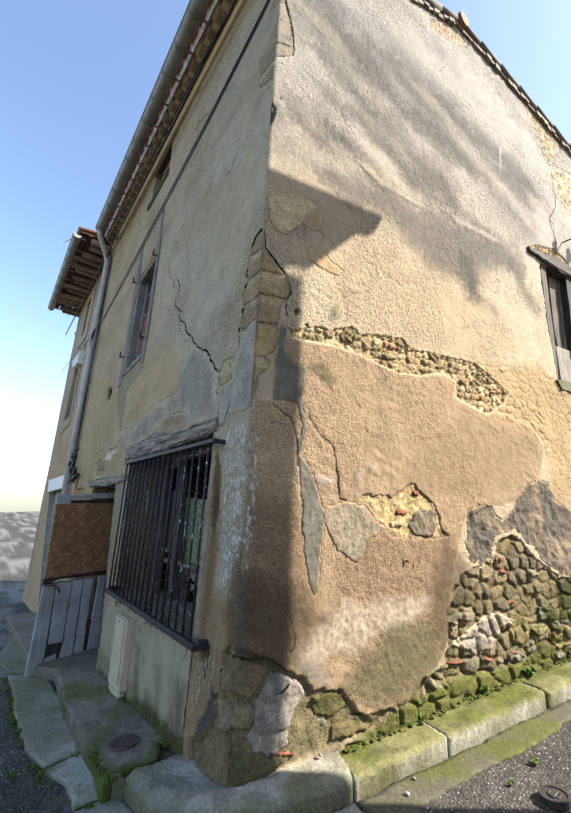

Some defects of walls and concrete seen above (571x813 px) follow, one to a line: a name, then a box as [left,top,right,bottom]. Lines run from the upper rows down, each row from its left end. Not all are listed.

flaking render [494,71,571,216]
crack [144,204,232,424]
flaking render [240,230,507,413]
leakage [327,163,524,296]
flaking render [531,246,566,263]
crack [271,405,348,501]
flaking render [360,484,447,539]
flaking render [417,535,571,700]
flaking render [182,610,396,787]